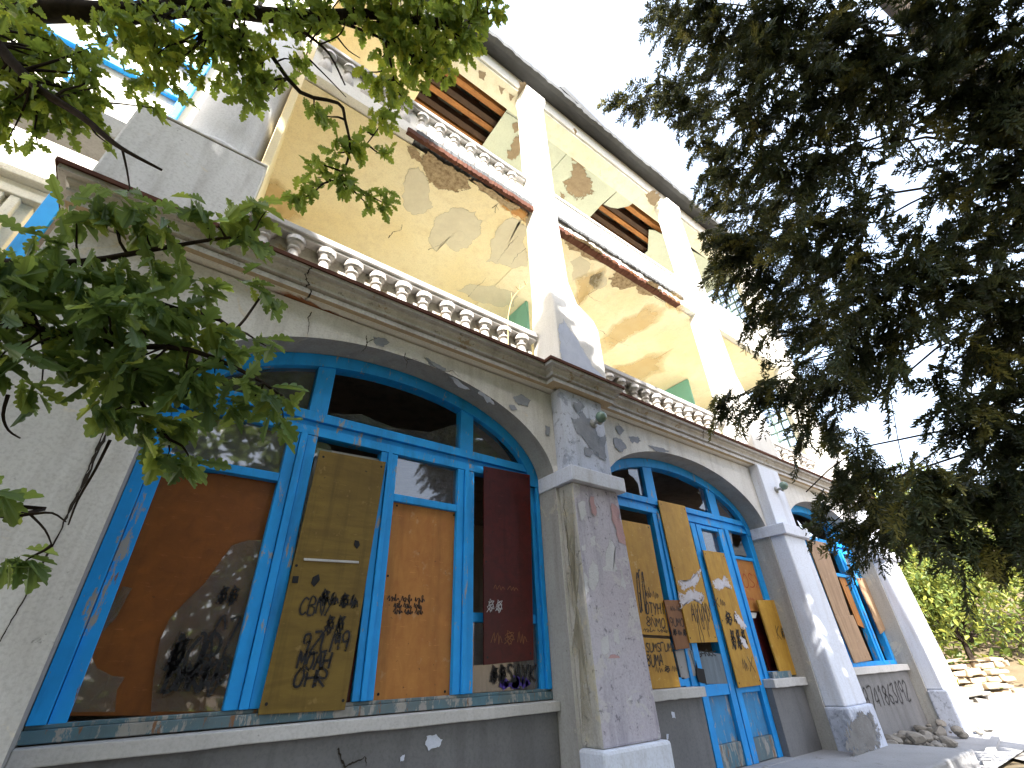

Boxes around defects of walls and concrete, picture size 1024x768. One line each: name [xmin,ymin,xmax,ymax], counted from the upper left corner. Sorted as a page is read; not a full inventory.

peeling [402,130,533,268]
spalling [559,158,681,308]
peeling [509,394,531,410]
peeling [425,734,443,751]